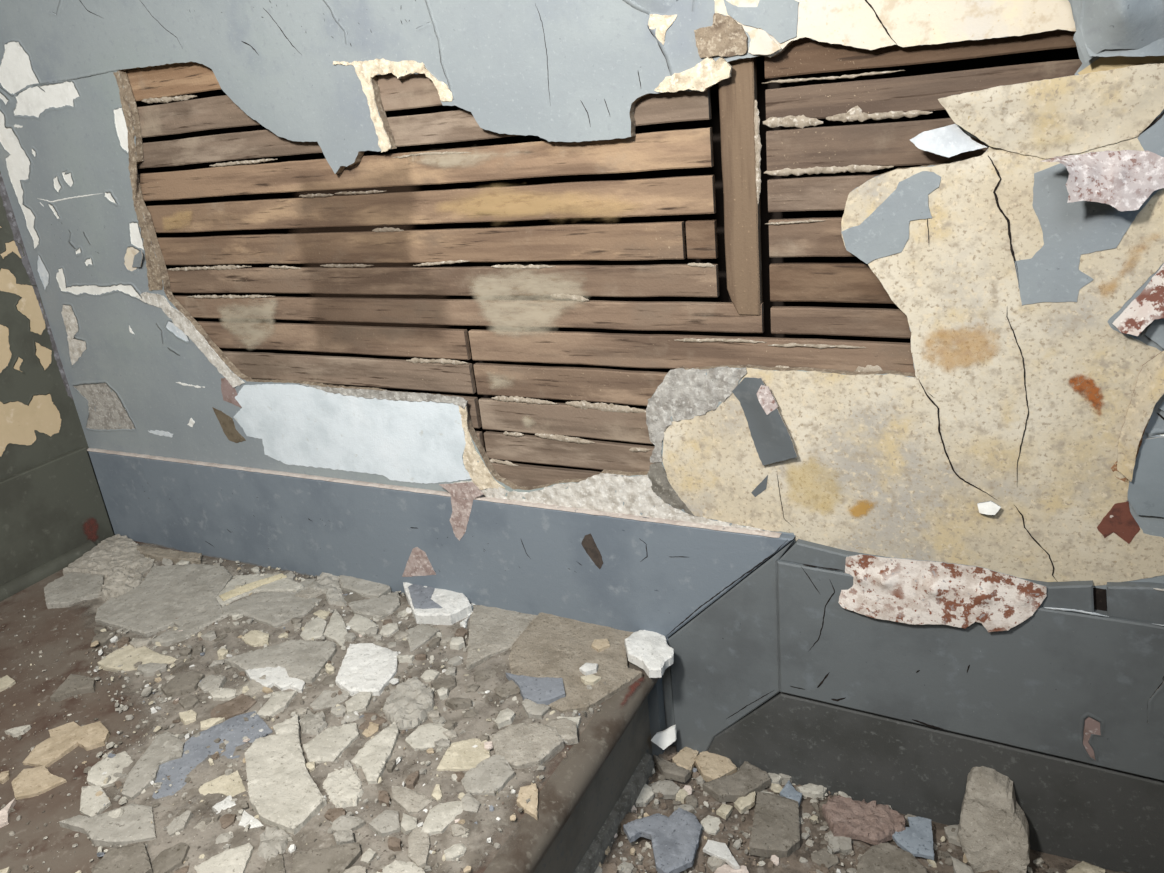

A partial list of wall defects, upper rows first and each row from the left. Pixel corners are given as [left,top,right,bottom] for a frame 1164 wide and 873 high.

crack [535,4,551,106]
crack [623,0,677,76]
crack [865,0,896,43]
crack [1140,111,1164,135]
crack [988,156,1020,289]
flaking render [0,0,1164,586]
crack [1006,316,1029,466]
crack [919,380,1057,581]
spalling [402,547,443,609]